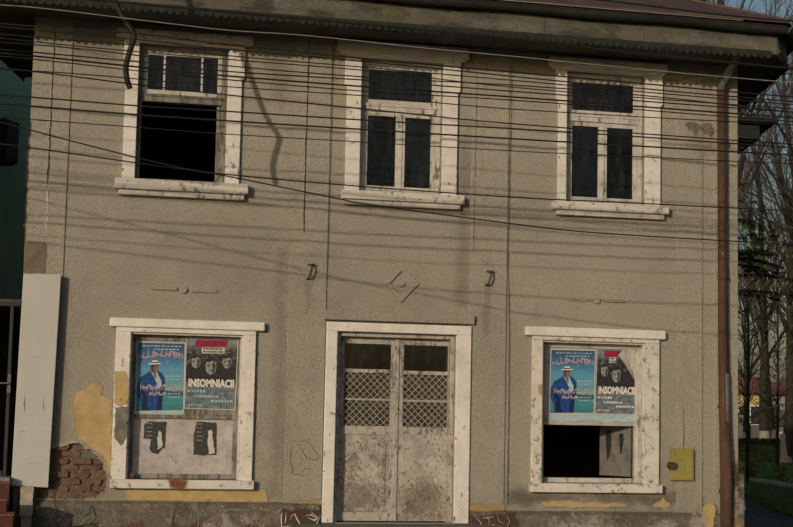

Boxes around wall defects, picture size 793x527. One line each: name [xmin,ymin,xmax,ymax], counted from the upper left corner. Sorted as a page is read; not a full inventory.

spalling [33,354,135,500]
corrosion [169,479,187,489]
peeling [124,487,269,502]
peeling [540,500,629,509]
peeling [701,502,717,527]